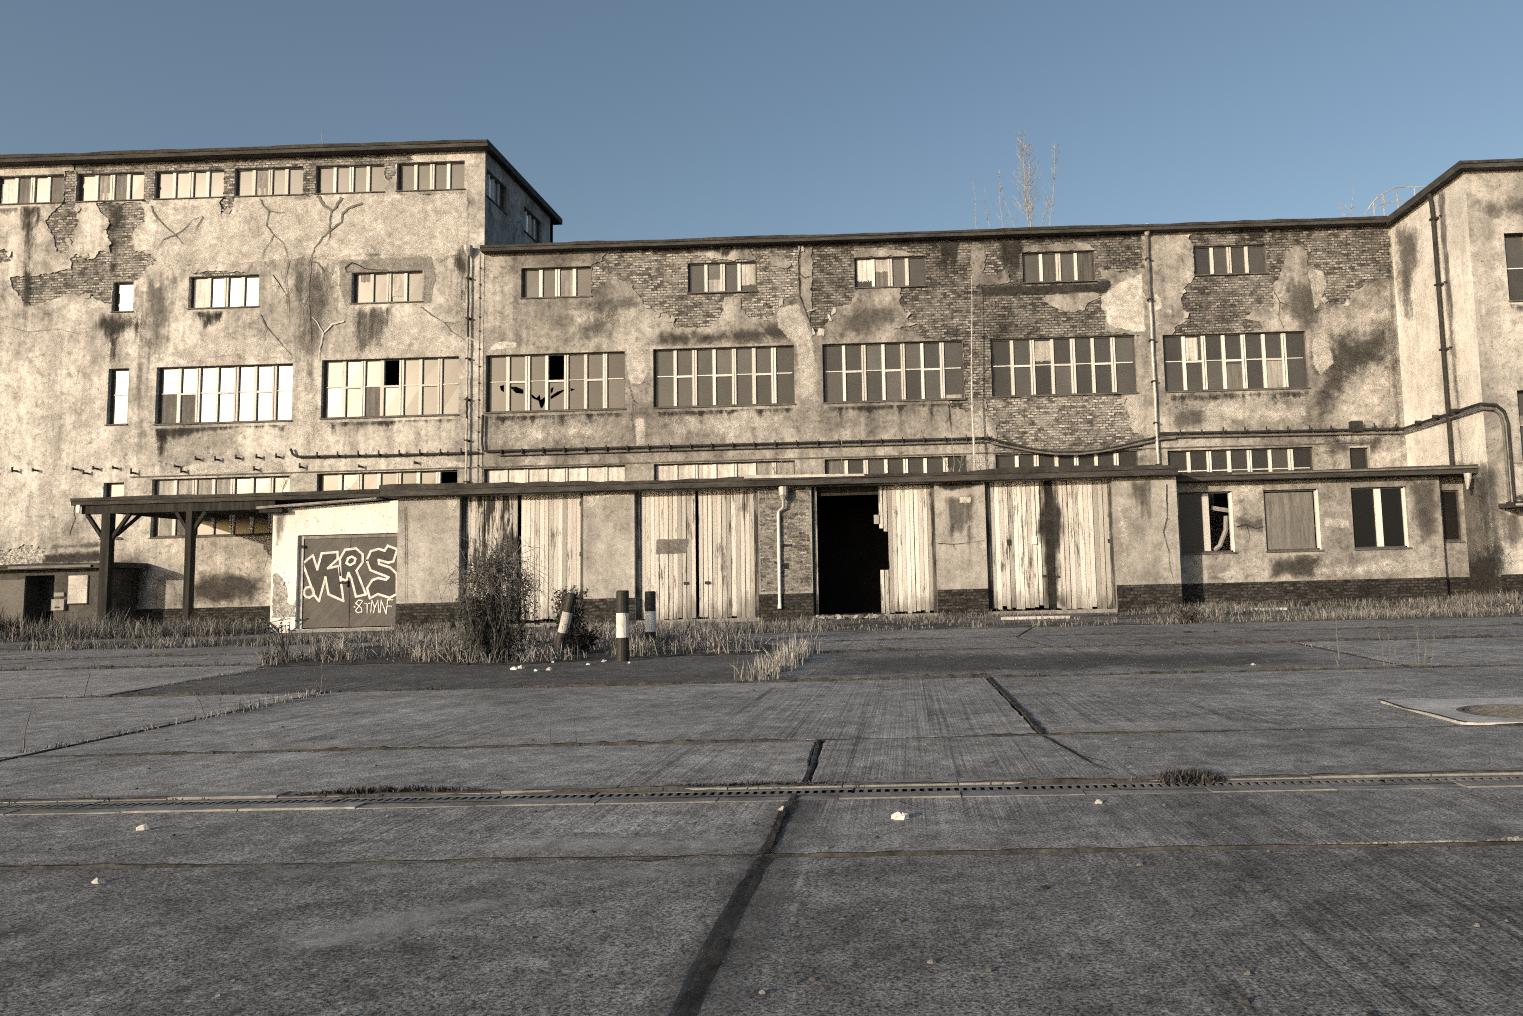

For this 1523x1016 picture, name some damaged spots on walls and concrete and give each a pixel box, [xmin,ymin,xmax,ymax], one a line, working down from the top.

damp [99,278,176,392]
crack [150,205,204,250]
flaking render [0,154,468,306]
crack [259,195,376,360]
damp [357,308,447,350]
flaking render [591,234,1162,456]
flaking render [1172,226,1392,335]
damp [1173,230,1416,427]
flaking render [1312,339,1333,374]
damp [1330,426,1395,454]
damp [1037,481,1062,606]